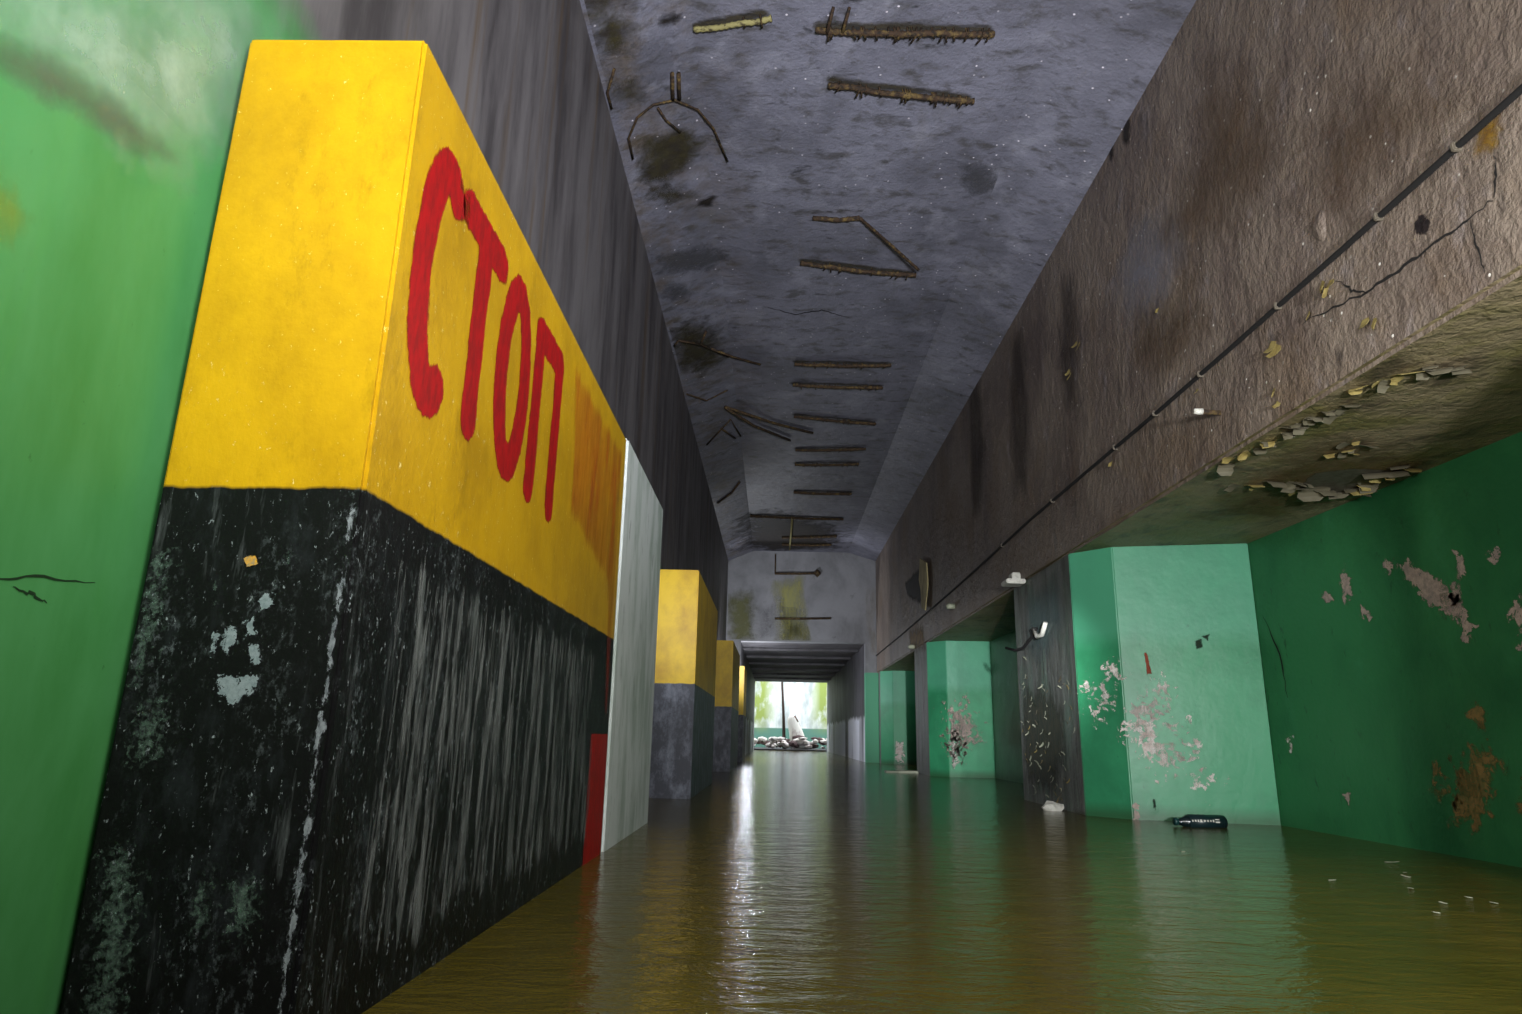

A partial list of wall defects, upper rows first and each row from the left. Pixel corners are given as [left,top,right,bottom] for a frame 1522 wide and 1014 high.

crack [1303,148,1497,324]
peeling [1264,341,1281,358]
peeling [1217,365,1472,514]
crack [0,574,95,603]
peeling [210,592,275,705]
peeling [1321,571,1372,621]
peeling [1383,550,1479,643]
peeling [1485,546,1501,565]
peeling [1507,593,1522,651]
peeling [939,695,986,769]
peeling [1021,656,1229,820]